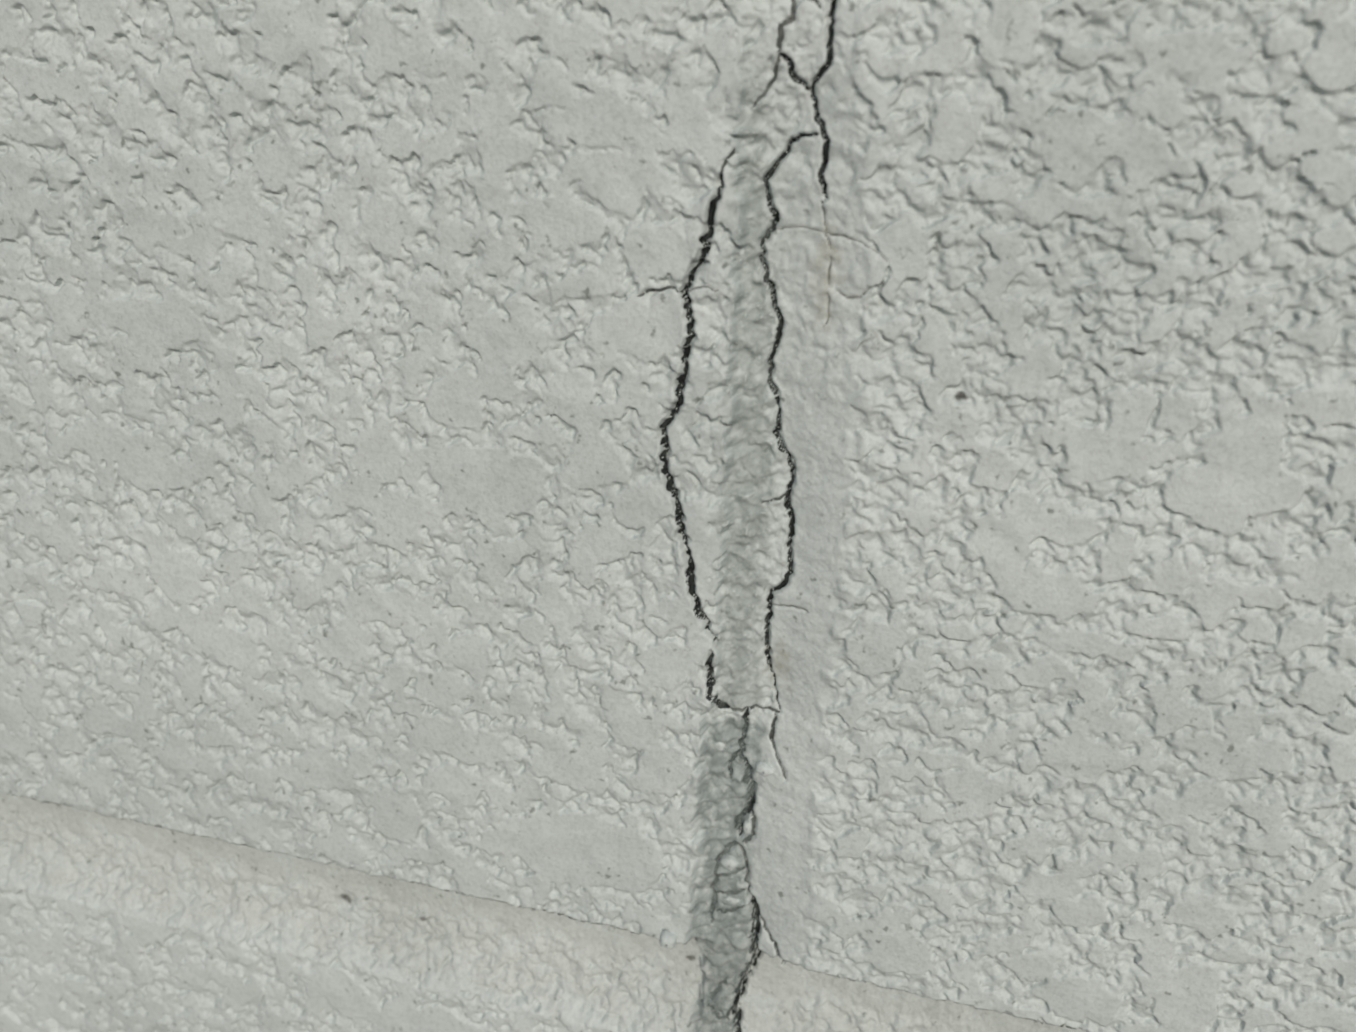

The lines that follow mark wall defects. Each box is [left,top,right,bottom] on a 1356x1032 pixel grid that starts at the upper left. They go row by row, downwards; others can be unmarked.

crack [637,0,888,1032]